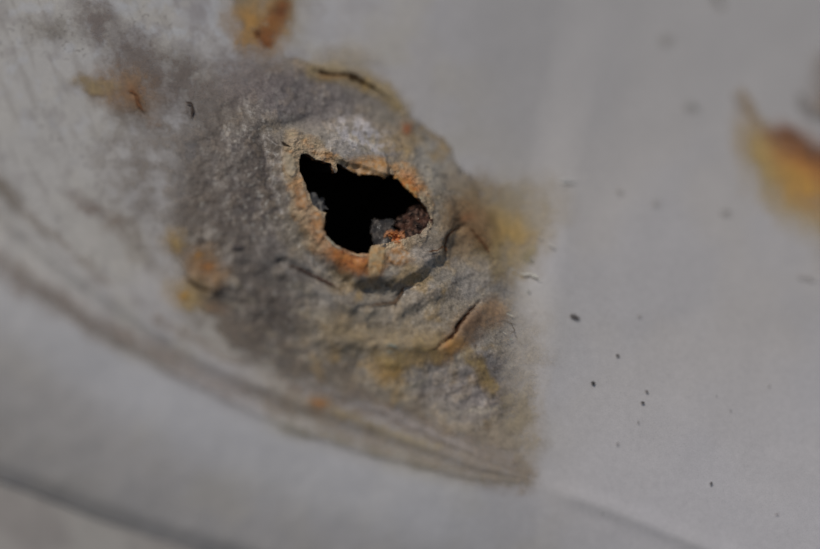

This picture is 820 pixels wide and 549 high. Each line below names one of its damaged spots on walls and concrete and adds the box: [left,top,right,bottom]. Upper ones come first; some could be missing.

rust [232,0,293,47]
crack [317,70,393,102]
rust [741,93,820,222]
spalling [283,151,422,276]
rust [384,230,406,244]
crack [431,305,476,350]